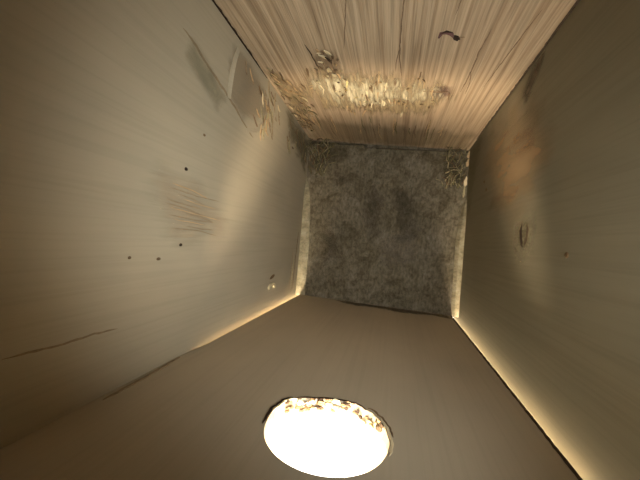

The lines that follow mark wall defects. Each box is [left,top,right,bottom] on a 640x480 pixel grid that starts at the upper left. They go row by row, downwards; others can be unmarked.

spalling [438,30,464,41]
crack [183,28,253,137]
spalling [306,50,450,118]
crack [2,329,115,360]
spalling [262,396,394,456]